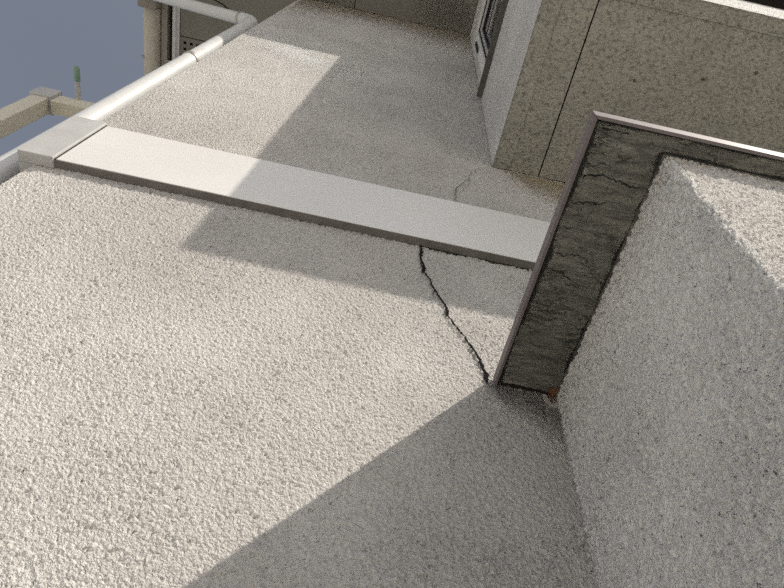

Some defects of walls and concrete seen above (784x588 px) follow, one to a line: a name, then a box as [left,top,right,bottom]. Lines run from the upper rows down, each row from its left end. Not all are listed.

crack [419,245,551,395]